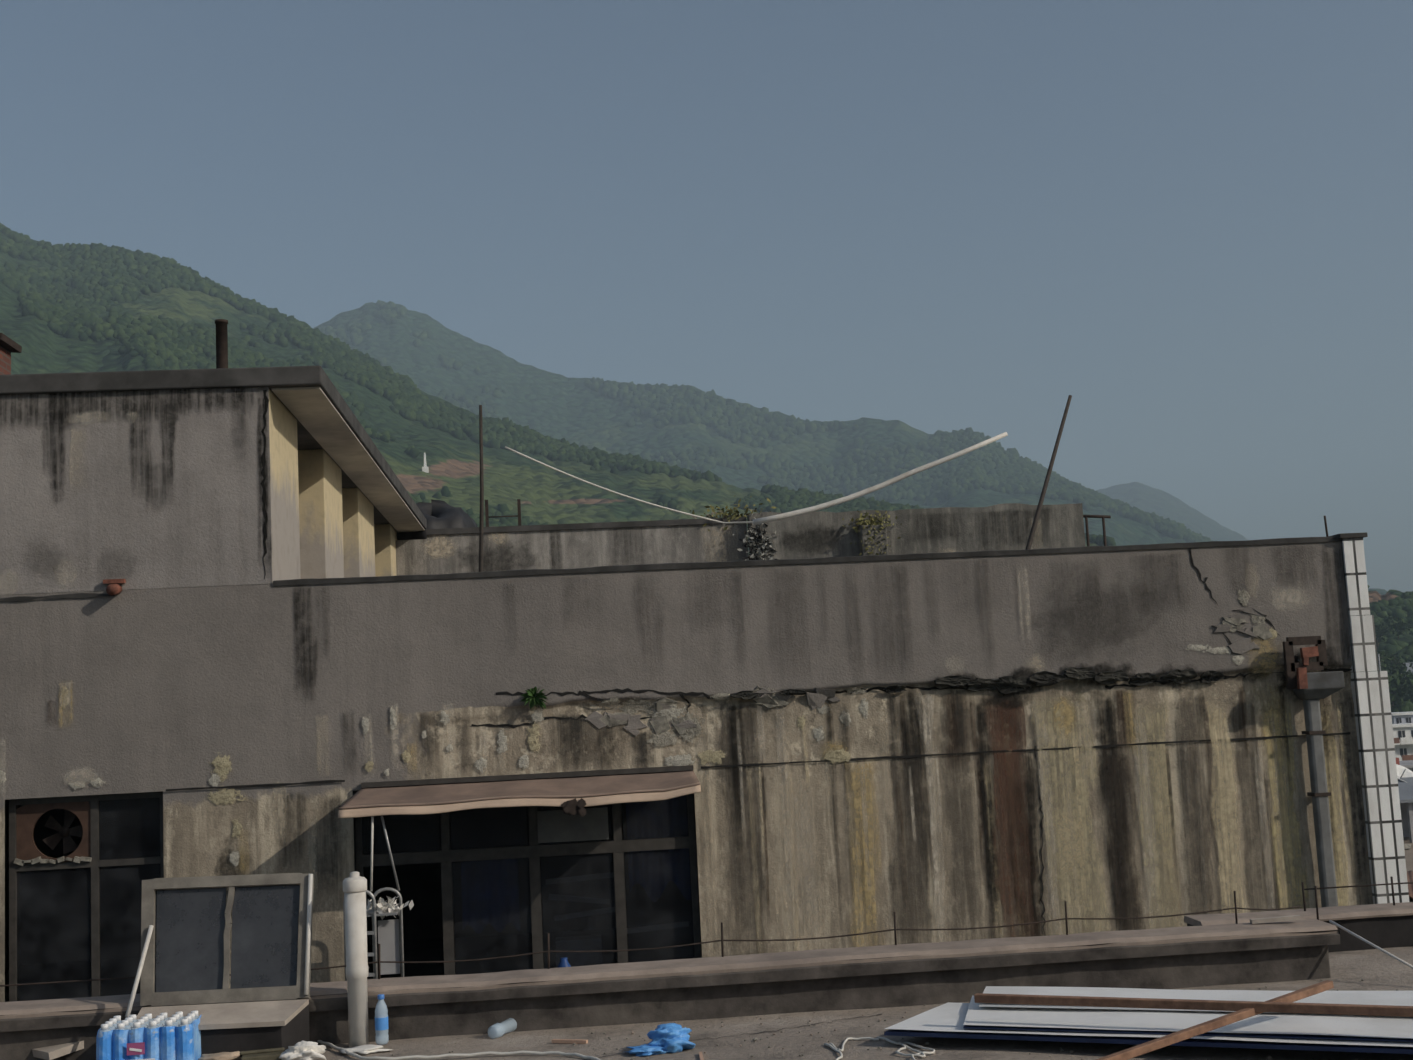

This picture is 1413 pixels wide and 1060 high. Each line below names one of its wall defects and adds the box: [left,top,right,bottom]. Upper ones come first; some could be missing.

leakage [0,388,271,558]
crack [261,390,269,579]
peeling [207,754,247,866]
leakage [294,589,316,685]
crack [471,688,736,728]
spalling [584,697,726,766]
leakage [720,708,769,919]
crack [797,686,984,695]
leakage [825,553,1348,947]
crack [1105,548,1283,690]
crack [1322,666,1352,674]
leakage [1321,700,1365,906]